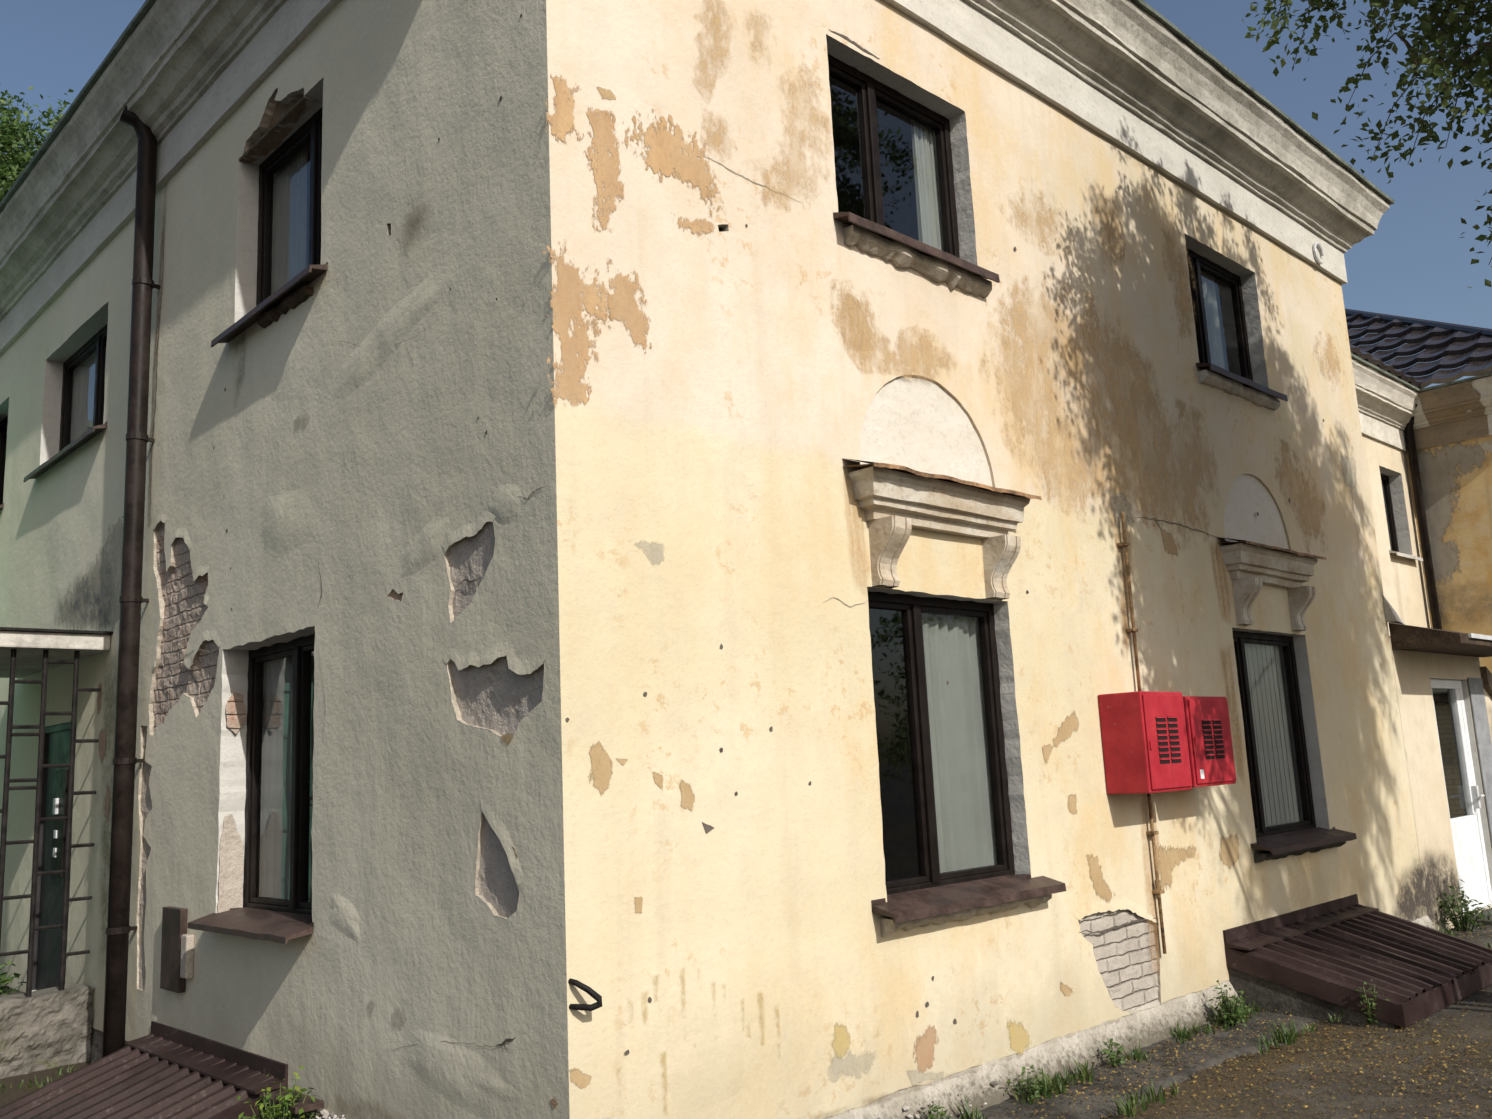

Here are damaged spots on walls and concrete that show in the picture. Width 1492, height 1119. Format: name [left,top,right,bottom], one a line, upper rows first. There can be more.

flaking render [239,88,318,163]
peeling [546,74,729,237]
peeling [542,242,652,406]
flaking render [442,496,496,623]
flaking render [1417,440,1492,617]
flaking render [137,512,222,991]
flaking render [442,642,547,745]
flaking render [218,814,244,913]
flaking render [475,799,524,920]
flaking render [1074,854,1161,1011]
leakage [1397,858,1460,922]
crack [384,1037,525,1052]